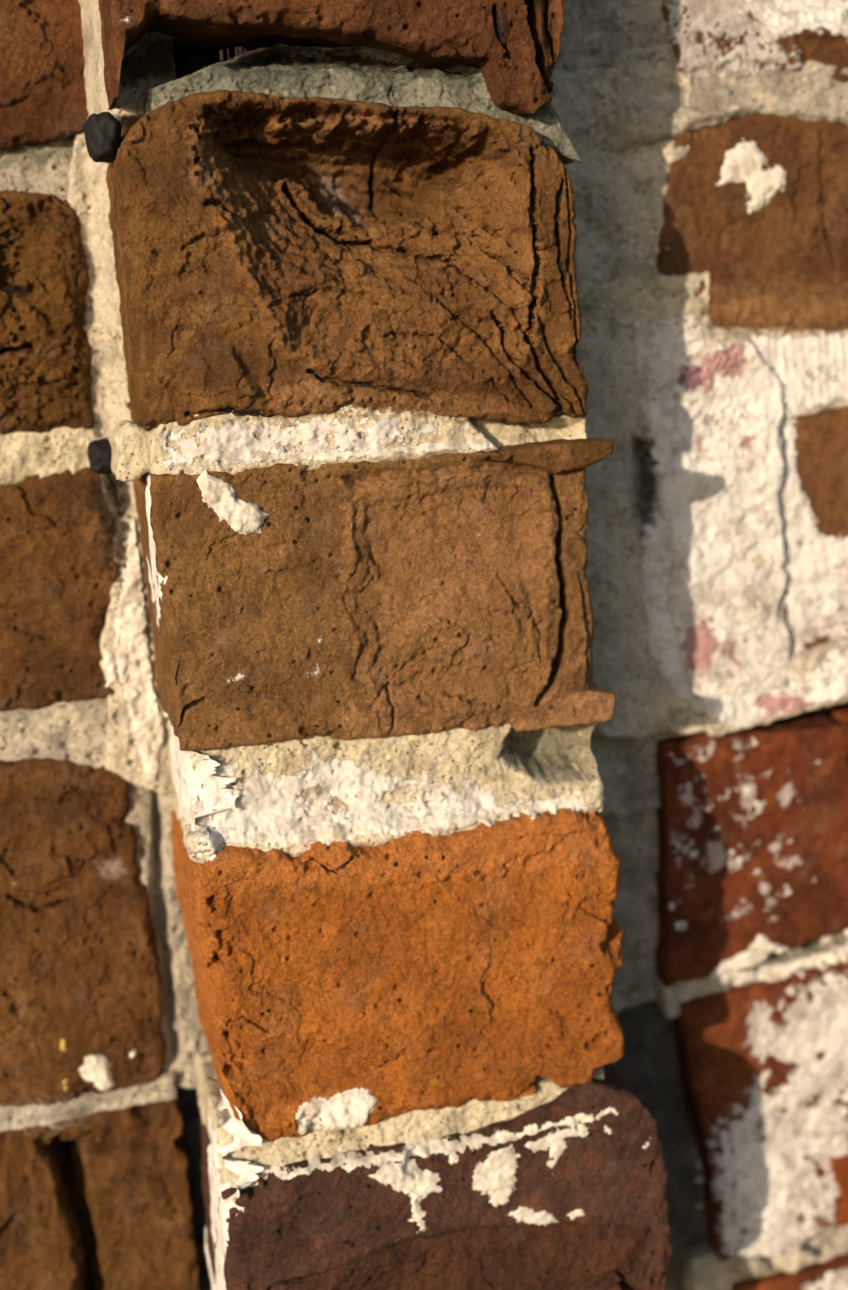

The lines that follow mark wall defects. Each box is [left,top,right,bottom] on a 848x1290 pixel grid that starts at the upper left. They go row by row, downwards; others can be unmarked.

peeling [662,0,848,81]
spalling [177,96,556,445]
spalling [327,438,616,731]
peeling [631,286,848,905]
crack [45,900,63,908]
peeling [710,831,806,922]
peeling [205,1089,264,1290]
spalling [285,1221,650,1290]
peeling [693,929,848,1261]